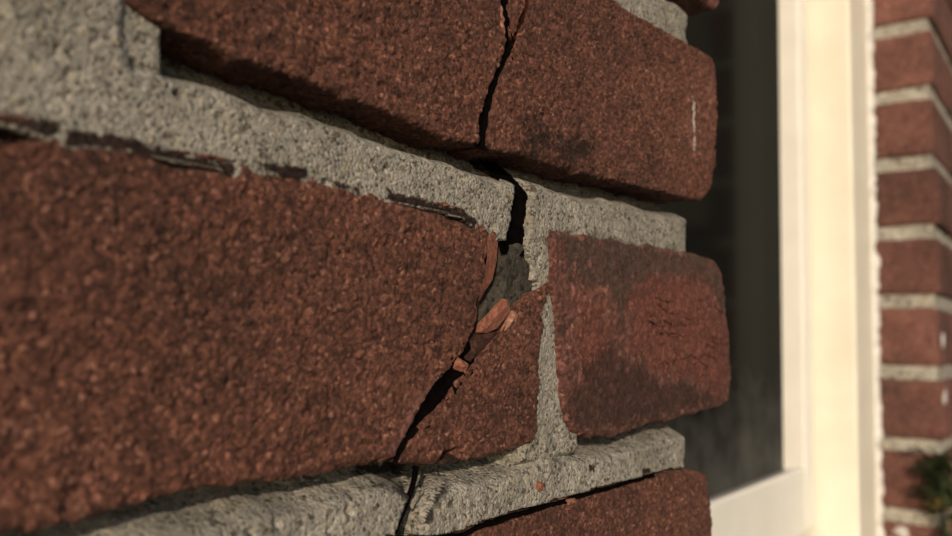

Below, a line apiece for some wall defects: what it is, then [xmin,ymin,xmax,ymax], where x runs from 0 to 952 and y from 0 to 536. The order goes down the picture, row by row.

crack [386,0,655,536]